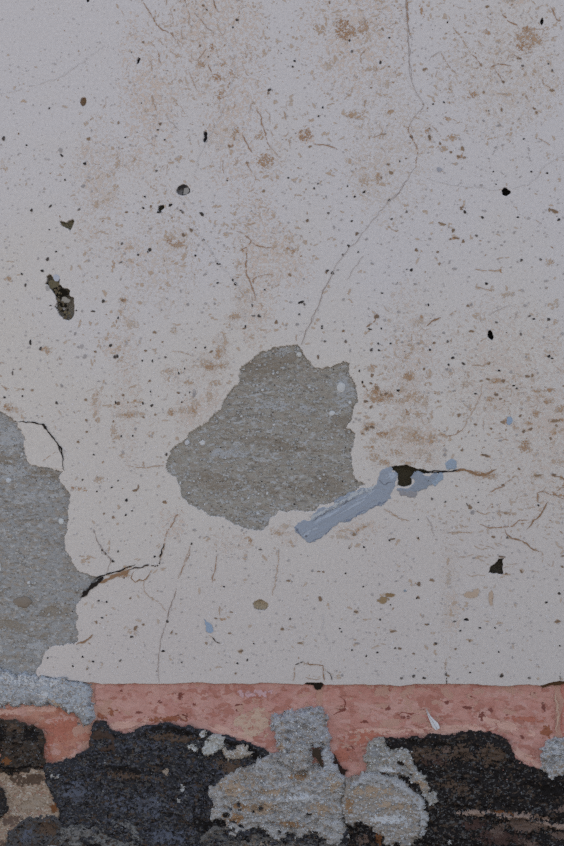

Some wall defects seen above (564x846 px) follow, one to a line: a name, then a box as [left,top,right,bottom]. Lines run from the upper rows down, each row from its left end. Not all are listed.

crack [296,0,558,345]
hole [40,257,75,320]
crack [20,421,64,470]
spalling [0,412,103,676]
crack [81,510,190,678]
spalling [165,345,373,530]
crack [428,468,515,493]
crack [385,475,564,561]